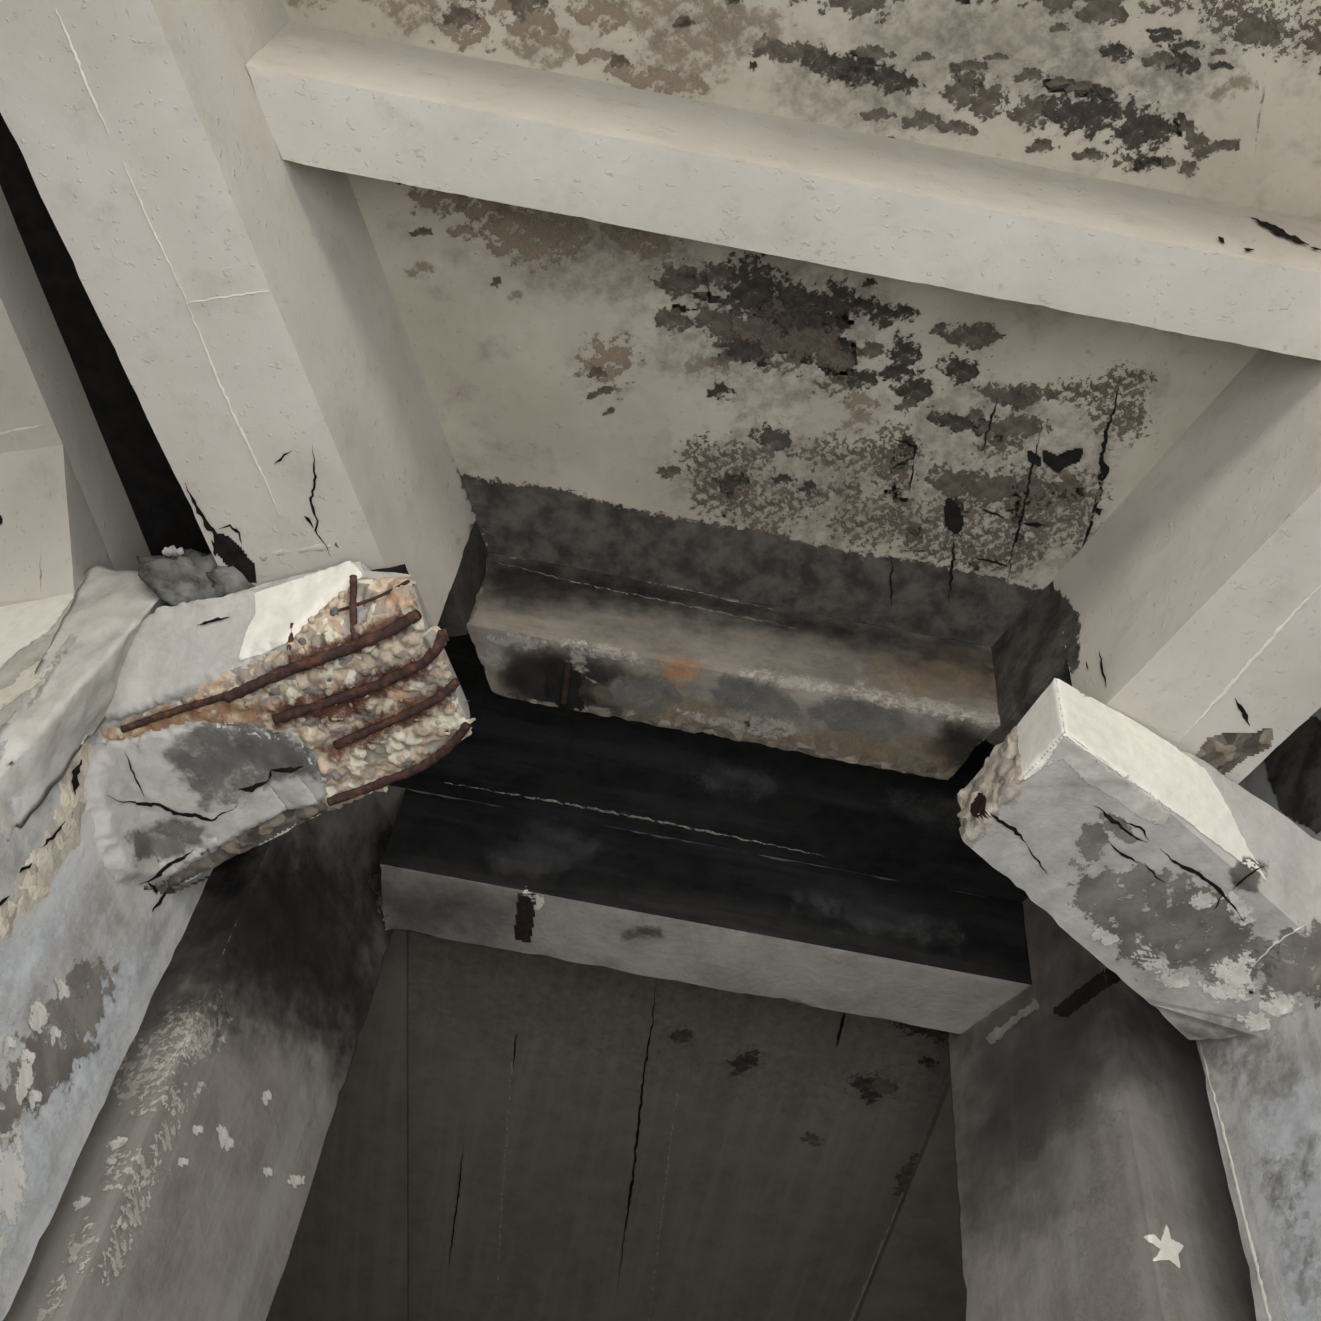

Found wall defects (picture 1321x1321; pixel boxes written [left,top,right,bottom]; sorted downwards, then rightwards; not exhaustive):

crack [185,483,257,583]
crack [1082,379,1121,548]
crack [107,750,304,822]
spalling [0,574,476,953]
rust [117,654,451,761]
rust [289,610,408,674]
water stain [459,474,1081,769]
spalling [574,701,1028,848]
spalling [1195,728,1274,775]
crack [1095,806,1268,921]
peeling [1067,812,1321,1033]
peeling [35,988,234,1321]